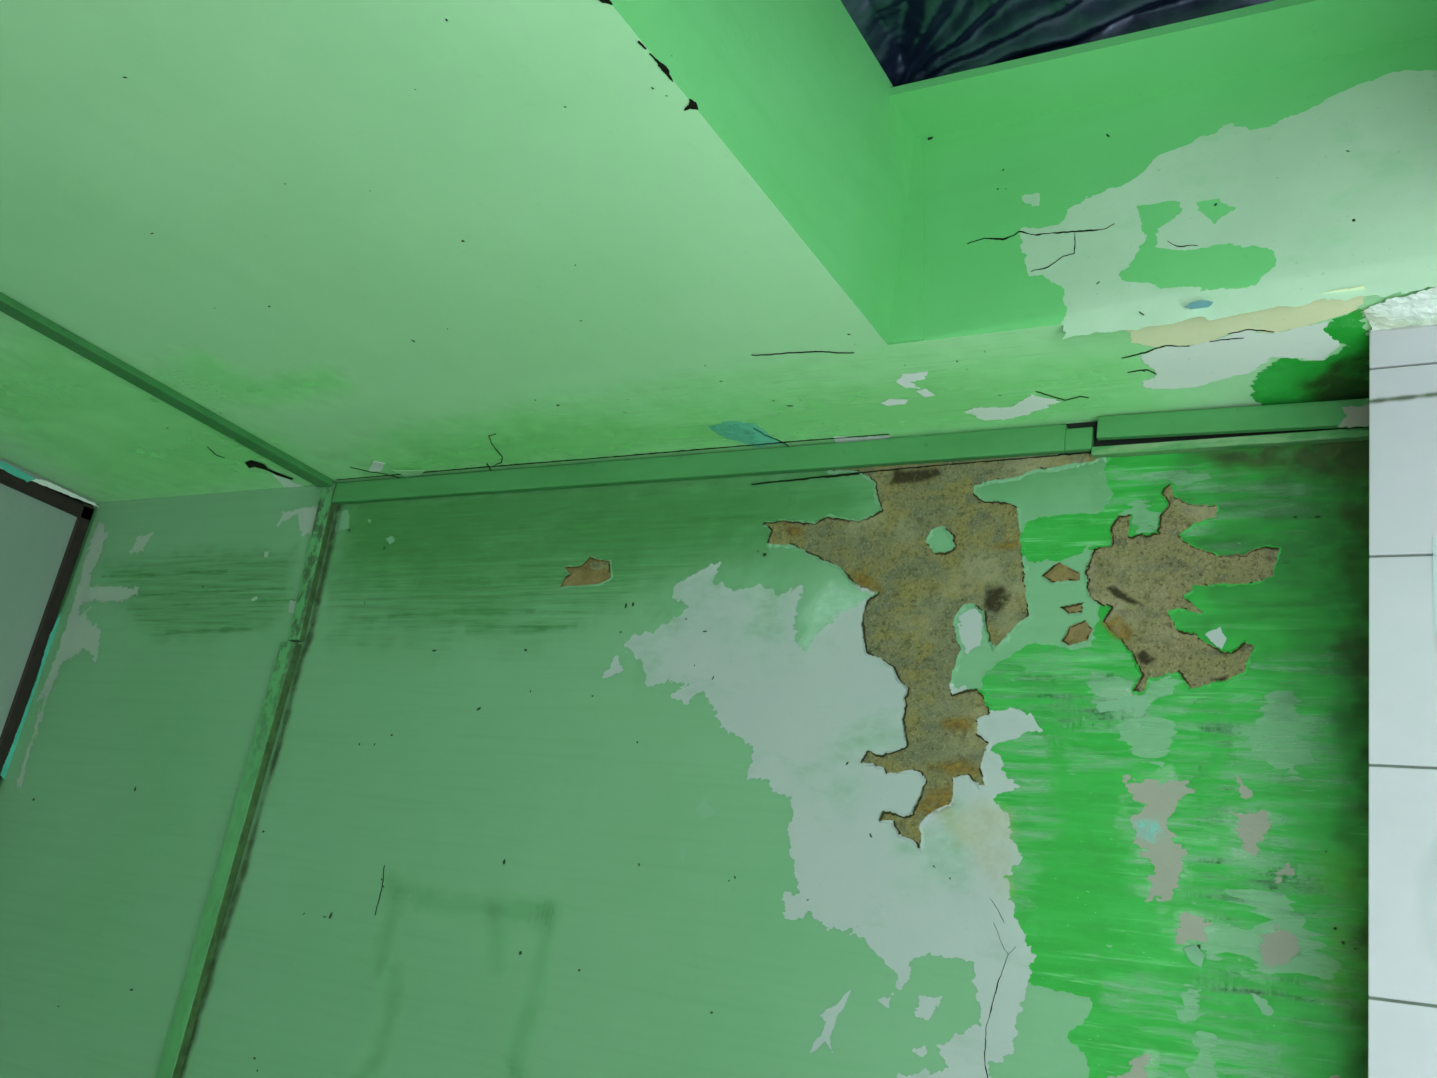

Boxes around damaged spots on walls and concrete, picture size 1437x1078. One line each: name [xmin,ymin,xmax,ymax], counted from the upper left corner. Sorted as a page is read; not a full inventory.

crack [967,224,1114,272]
peeling [1020,70,1437,406]
peeling [708,421,789,447]
peeling [881,371,934,406]
peeling [965,395,1061,421]
peeling [1337,404,1369,428]
spalling [559,556,613,589]
peeling [0,462,139,789]
peeling [602,443,1369,1078]
crack [984,900,1014,1078]